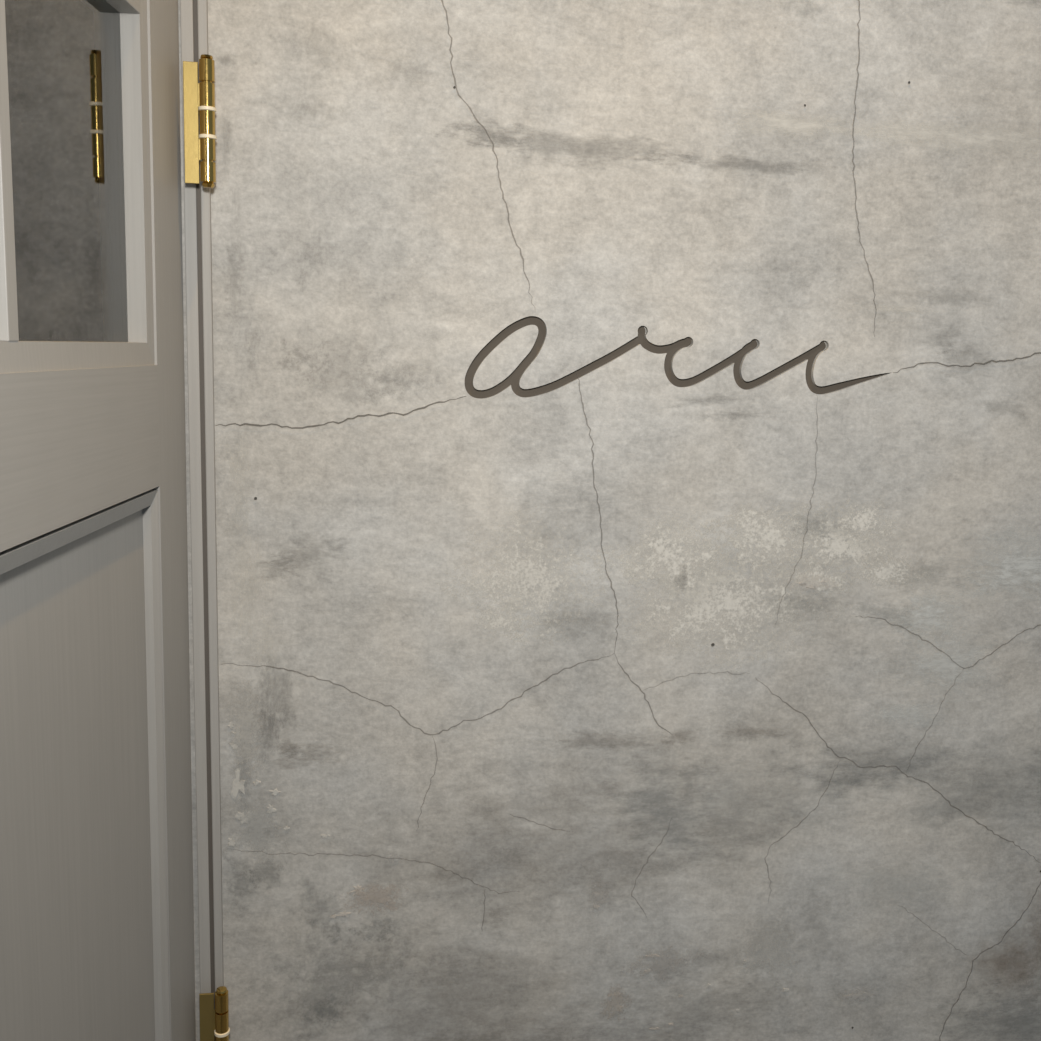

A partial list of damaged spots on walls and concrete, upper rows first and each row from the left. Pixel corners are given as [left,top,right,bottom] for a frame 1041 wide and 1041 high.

crack [893,352,1041,373]
crack [215,396,465,429]